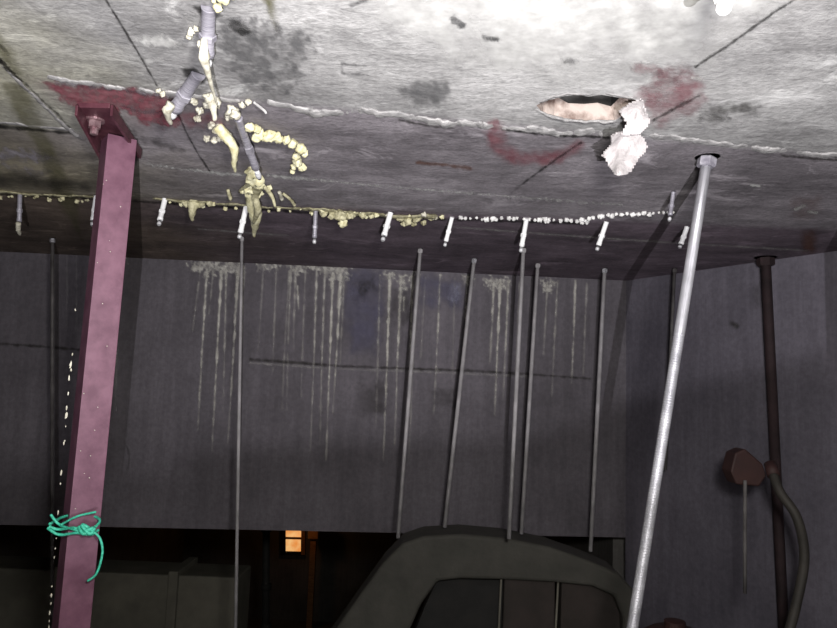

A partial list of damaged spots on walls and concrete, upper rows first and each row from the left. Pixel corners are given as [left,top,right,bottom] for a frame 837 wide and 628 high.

crack [106,0,157,85]
damp [140,36,177,47]
crack [695,1,792,68]
crack [0,58,83,140]
crack [151,115,242,176]
crack [267,174,379,186]
spalling [535,93,658,176]
damp [193,262,239,363]
damp [312,266,348,350]
damp [386,273,413,360]